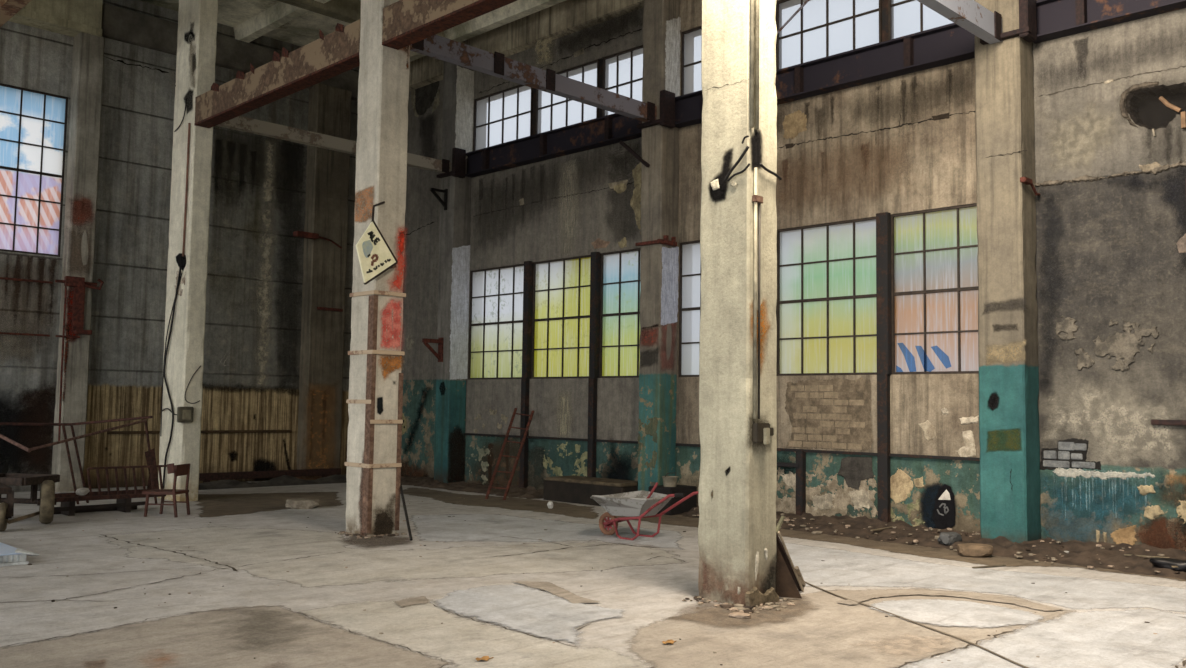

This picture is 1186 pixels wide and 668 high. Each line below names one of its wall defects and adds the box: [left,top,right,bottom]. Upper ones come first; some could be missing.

spalling [1119,74,1186,140]
leakage [1123,167,1186,239]
leakage [5,231,90,316]
leakage [214,132,305,387]
peeling [468,407,508,485]
peeling [543,442,598,477]
leakage [1055,392,1171,456]
peeling [776,467,925,527]
leakage [761,555,777,594]